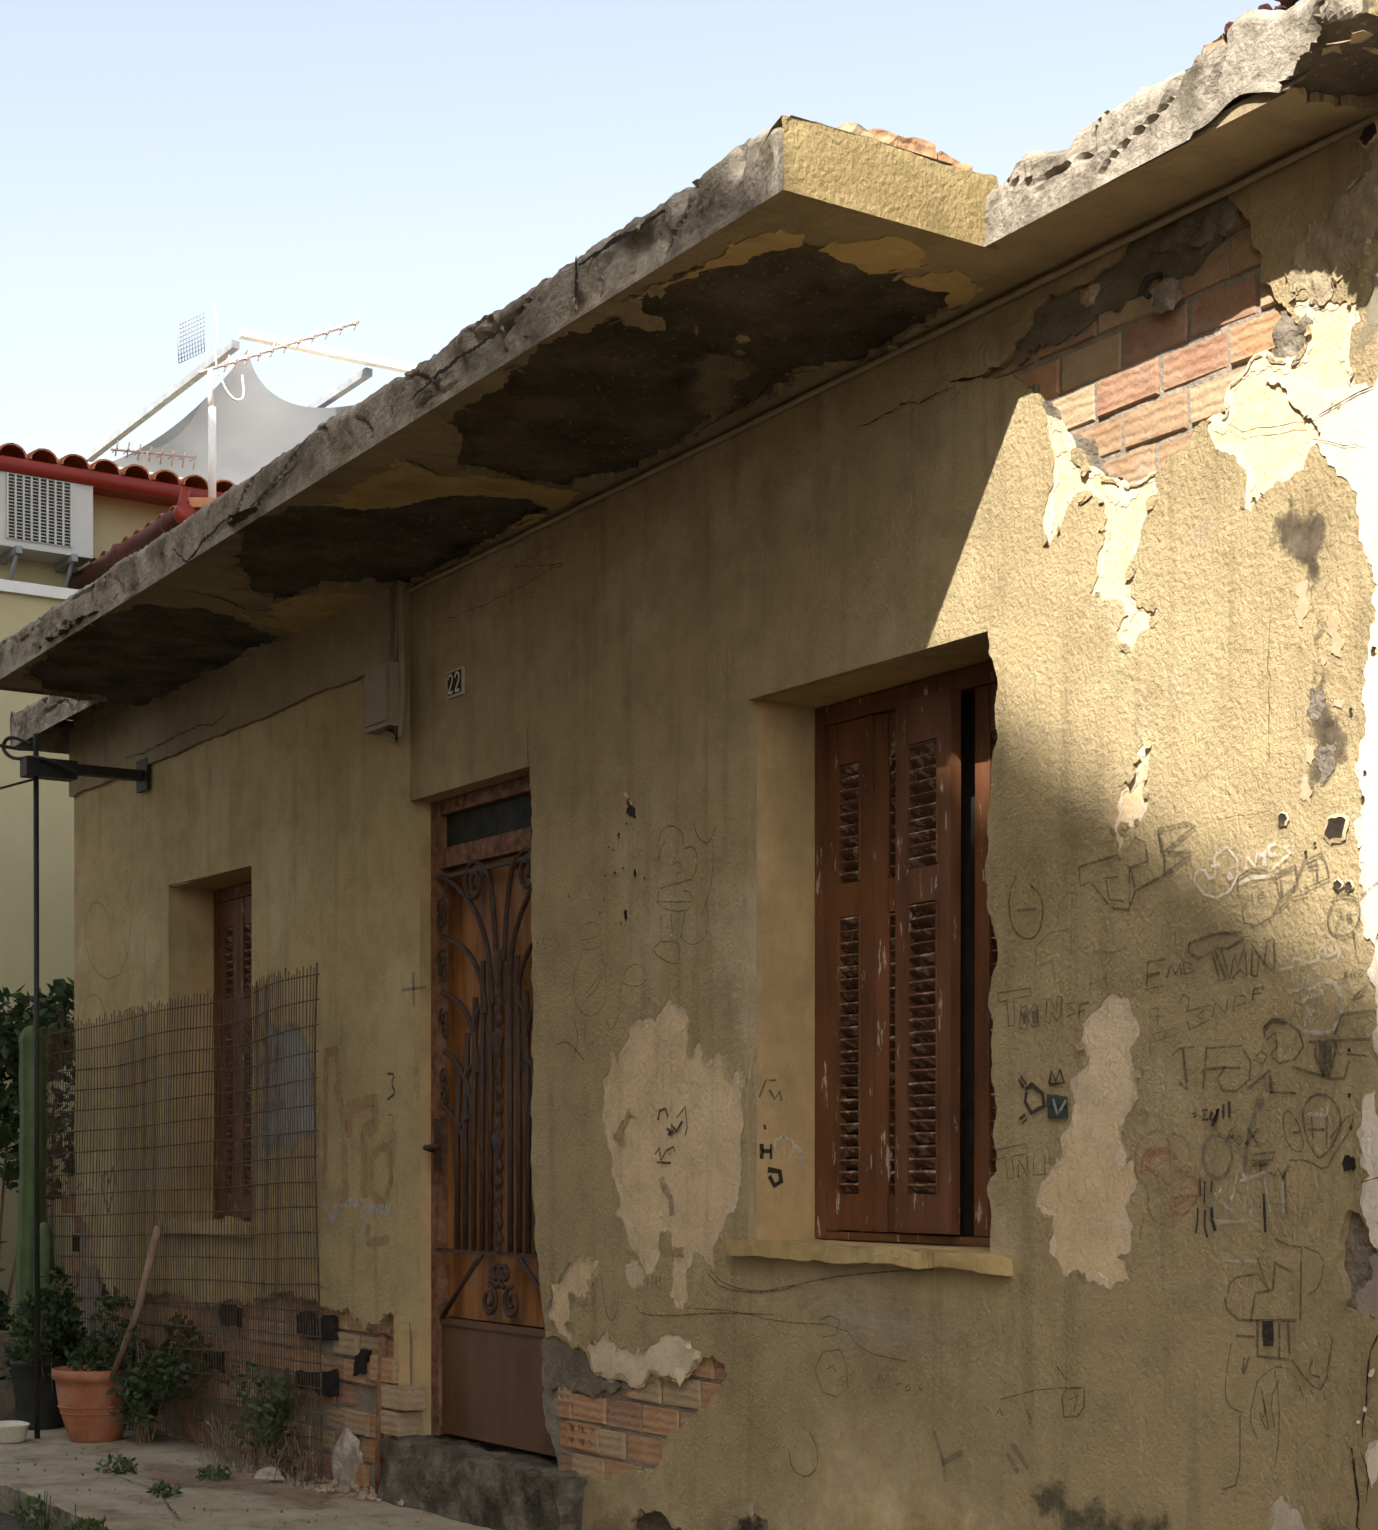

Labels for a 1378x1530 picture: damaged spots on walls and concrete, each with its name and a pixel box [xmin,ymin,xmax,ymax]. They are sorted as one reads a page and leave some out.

spalling [1279,12,1378,98]
spalling [227,229,984,606]
spalling [28,604,280,706]
spalling [986,195,1378,1055]
water stain [1274,501,1347,805]
peeling [602,995,750,1309]
peeling [1036,993,1141,1289]
spalling [1334,1090,1378,1320]
spalling [541,1250,727,1482]
water stain [1036,1486,1169,1530]
crack [1345,1335,1378,1530]
peeling [1365,1440,1378,1488]